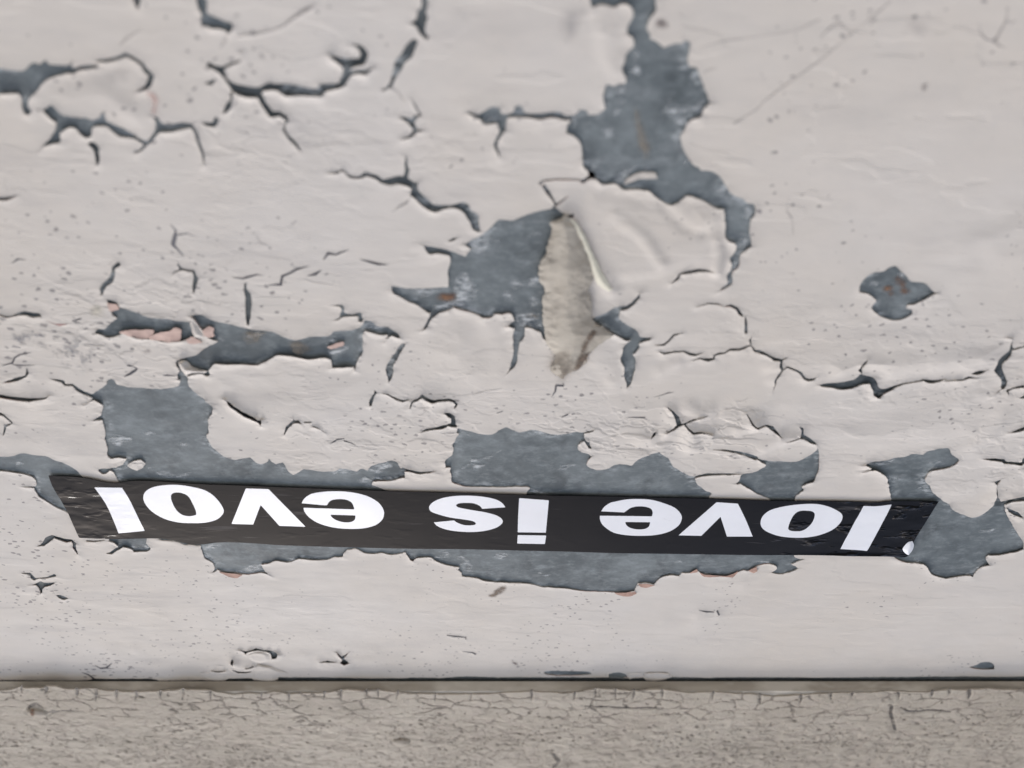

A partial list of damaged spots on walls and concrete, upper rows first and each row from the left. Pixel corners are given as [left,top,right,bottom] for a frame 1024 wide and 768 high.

peeling [0,60,207,168]
crack [203,0,431,154]
crack [328,101,482,241]
peeling [466,0,759,294]
crack [0,353,54,435]
crack [368,343,461,434]
peeling [48,300,821,501]
peeling [387,209,654,387]
crack [657,303,1024,401]
peeling [86,538,801,597]
peeling [859,448,1024,581]
crack [0,648,1024,768]